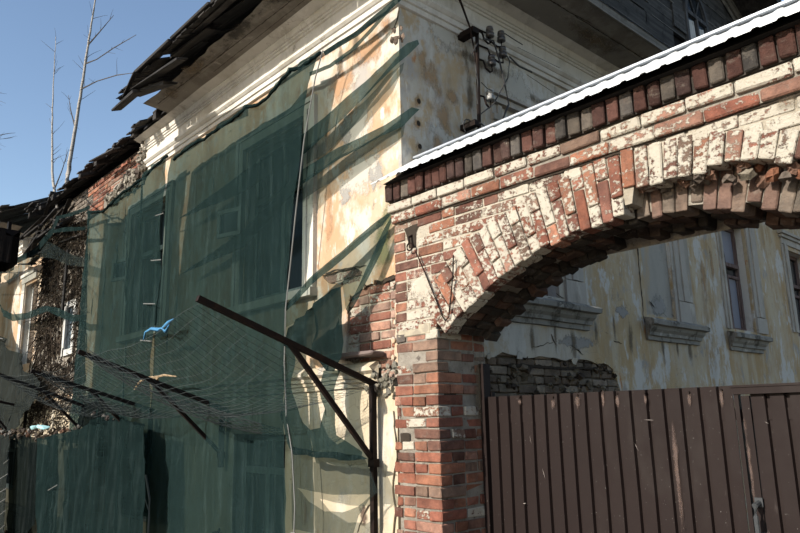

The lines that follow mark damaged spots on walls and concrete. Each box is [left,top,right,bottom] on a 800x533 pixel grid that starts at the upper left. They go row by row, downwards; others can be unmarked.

spalling [390,7,405,45]
water stain [329,51,353,101]
peeling [340,101,373,145]
flaking render [56,154,140,234]
peeling [340,153,383,205]
spalling [660,161,800,194]
spalling [404,224,419,248]
peeling [411,270,435,302]
spalling [485,351,619,407]